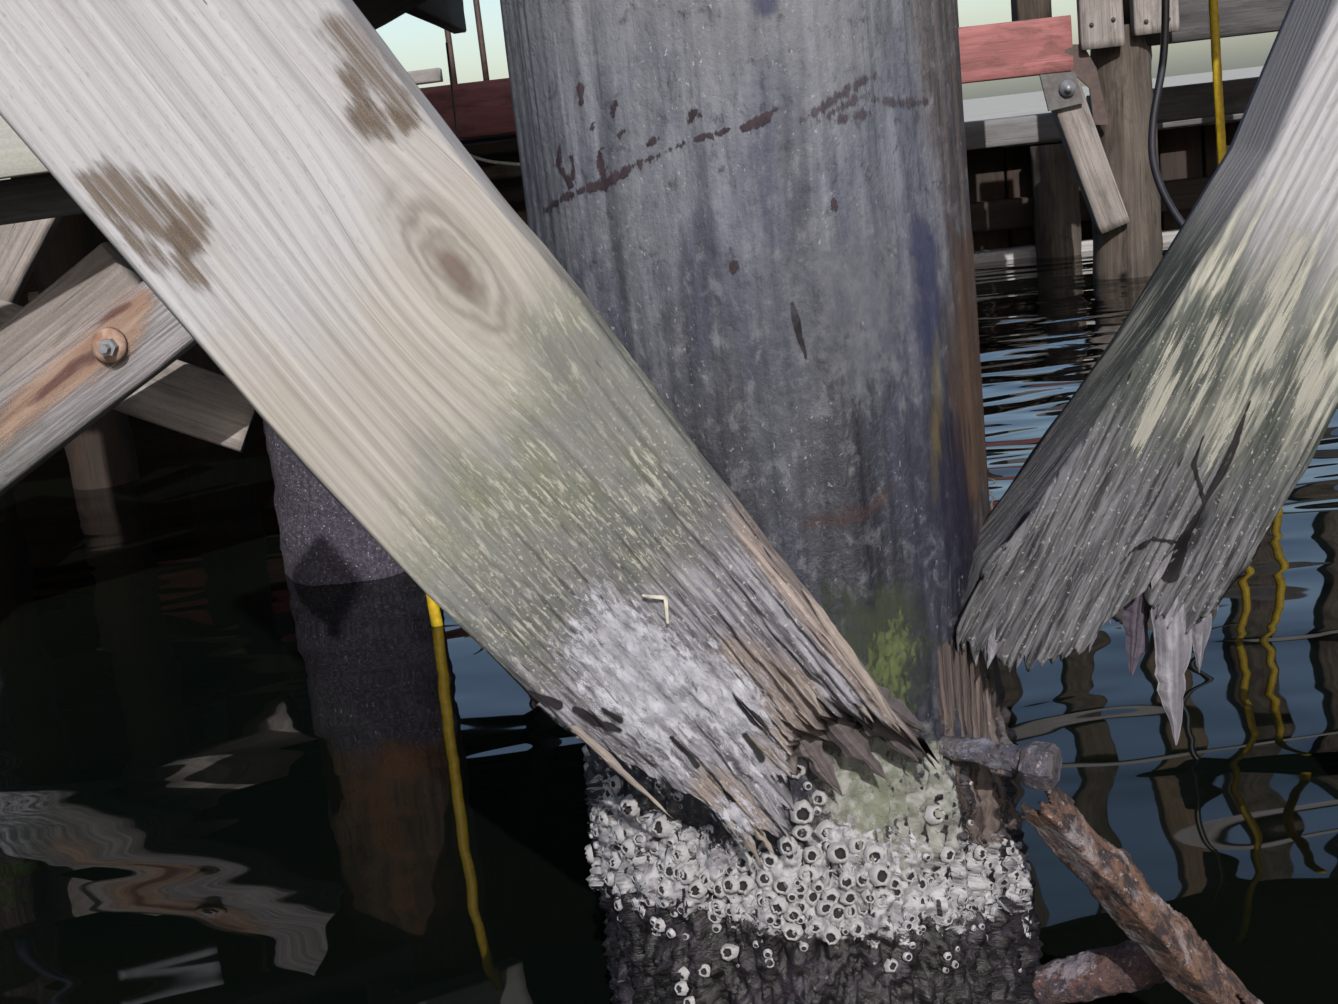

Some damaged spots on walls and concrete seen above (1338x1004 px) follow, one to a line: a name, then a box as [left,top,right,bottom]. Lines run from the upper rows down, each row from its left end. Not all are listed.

leakage [323,17,421,140]
leakage [78,164,208,288]
crack [1120,401,1251,583]